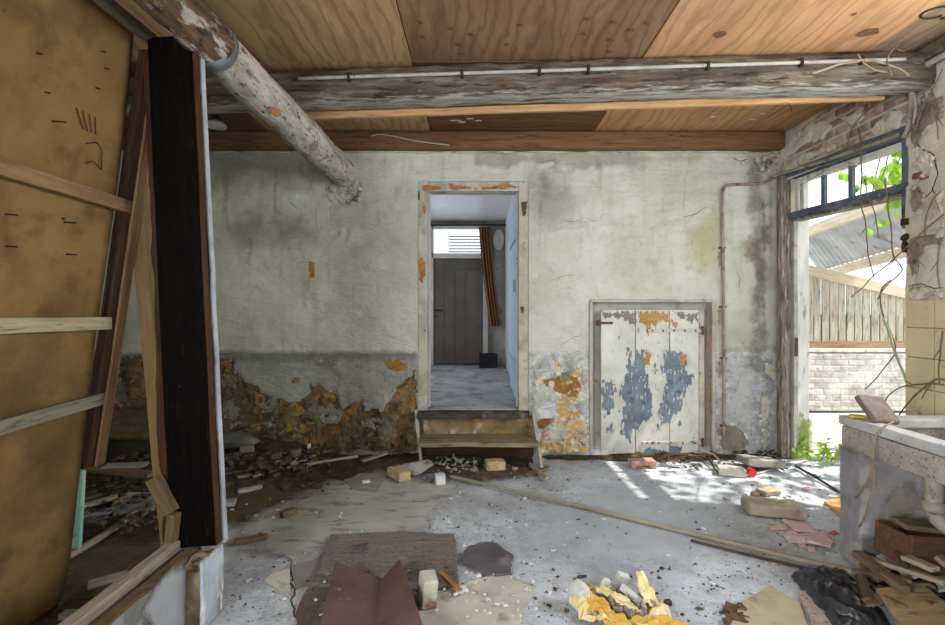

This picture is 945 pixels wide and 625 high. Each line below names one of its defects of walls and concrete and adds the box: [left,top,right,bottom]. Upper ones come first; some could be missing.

peeling [418,182,518,214]
flaking render [755,87,945,300]
peeling [418,257,426,283]
peeling [602,309,698,336]
flaking render [113,353,147,410]
flaking render [219,357,420,454]
flaking render [536,363,589,454]
peeling [601,335,694,443]
peeling [643,444,684,454]
crack [278,555,296,618]